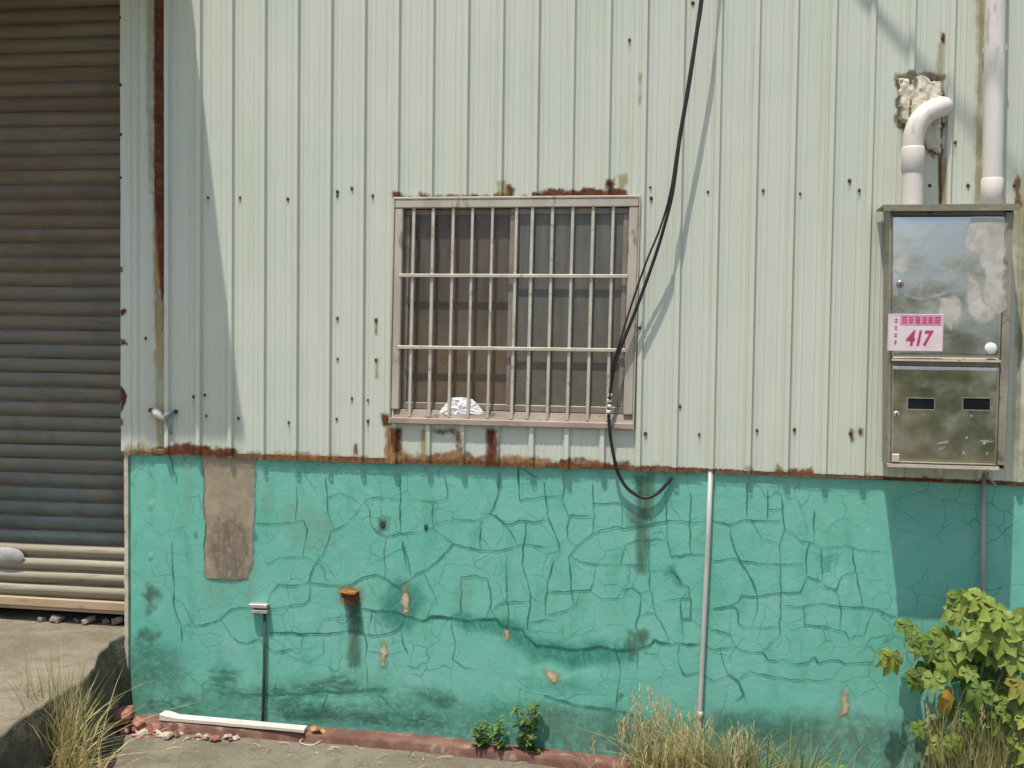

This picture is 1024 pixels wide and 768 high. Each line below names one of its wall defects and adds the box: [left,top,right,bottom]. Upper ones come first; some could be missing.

rust [125,0,701,473]
crack [171,467,898,718]
leakage [636,476,652,571]
rust [768,465,888,480]